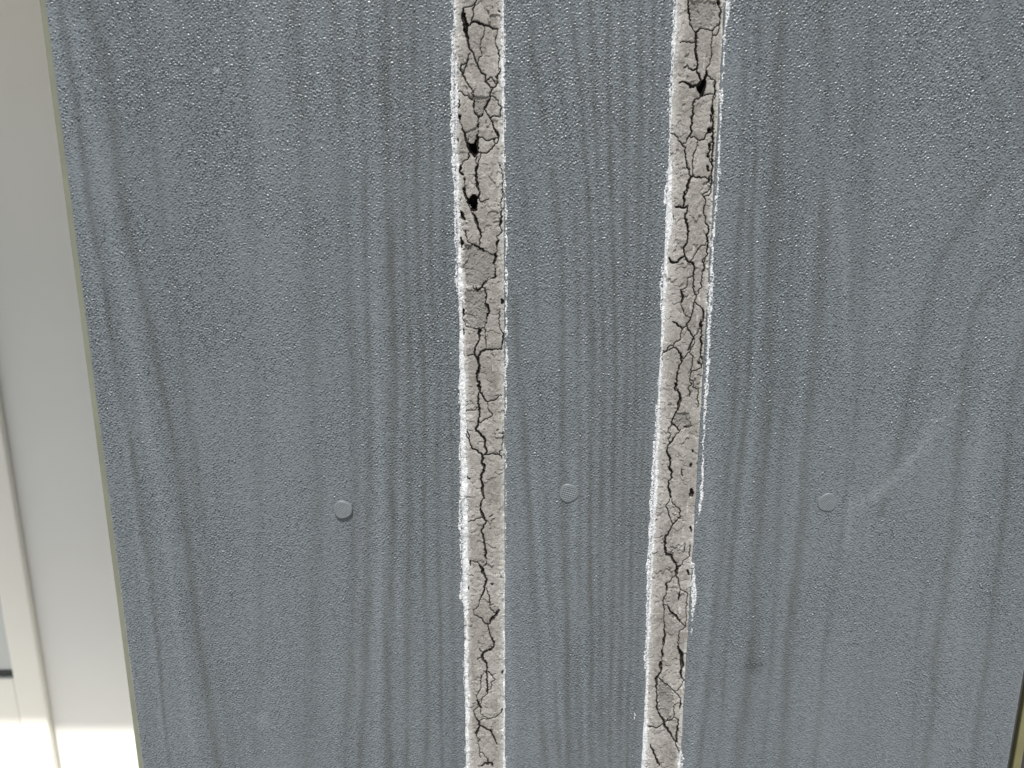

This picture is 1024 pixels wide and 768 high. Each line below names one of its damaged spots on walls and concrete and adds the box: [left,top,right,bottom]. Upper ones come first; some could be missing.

spalling [458,96,488,143]
peeling [707,0,731,200]
crack [460,0,504,766]
spalling [460,172,509,418]
crack [660,0,722,630]
peeling [681,424,706,532]
peeling [491,573,507,768]
crack [647,658,680,766]
peeling [678,546,697,641]